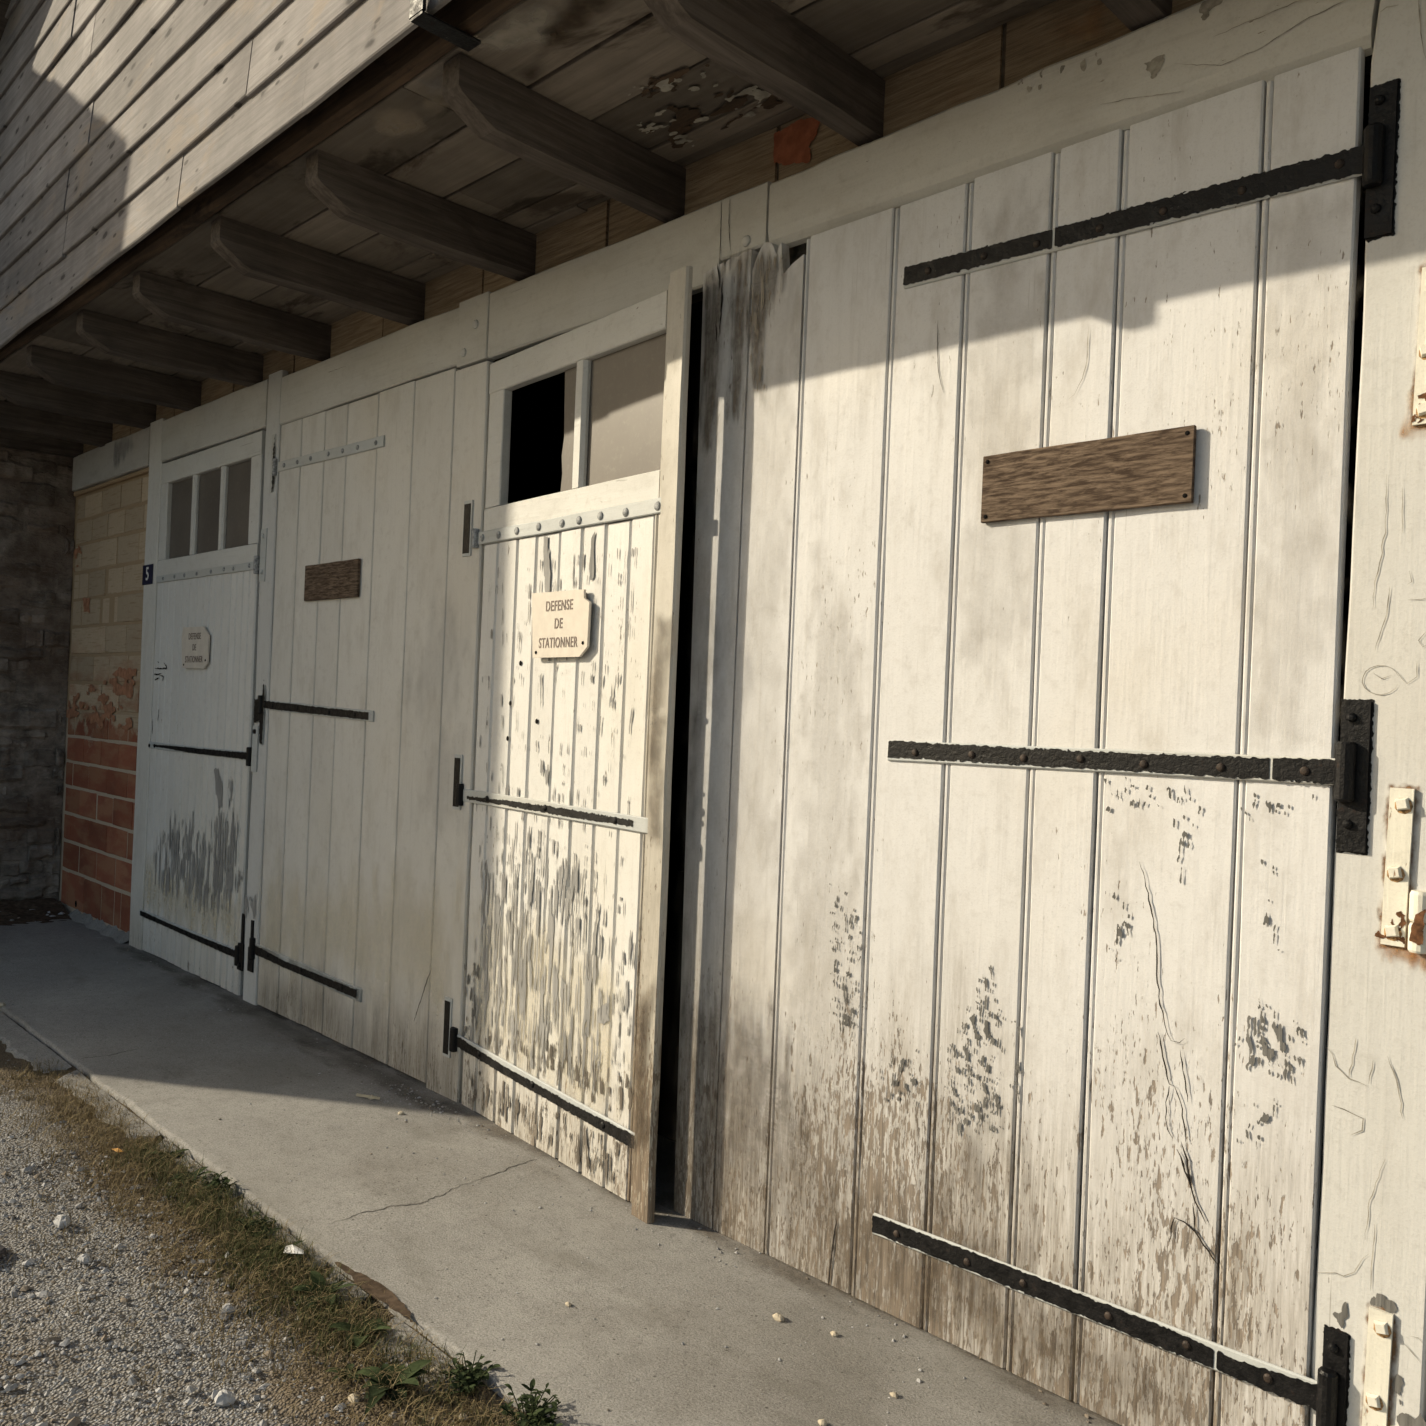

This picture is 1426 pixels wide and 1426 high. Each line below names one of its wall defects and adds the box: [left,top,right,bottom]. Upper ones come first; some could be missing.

corrosion [1401,377,1426,435]
peeling [489,532,636,649]
peeling [463,644,634,1111]
peeling [1104,777,1201,883]
corrosion [1375,849,1426,964]
corrosion [1386,785,1419,830]
peeling [468,1071,619,1185]
peeling [945,965,1023,1136]
crack [1139,862,1220,1268]
peeling [1237,1098,1278,1145]
peeling [1234,1002,1304,1084]
corrosion [1363,1307,1397,1426]